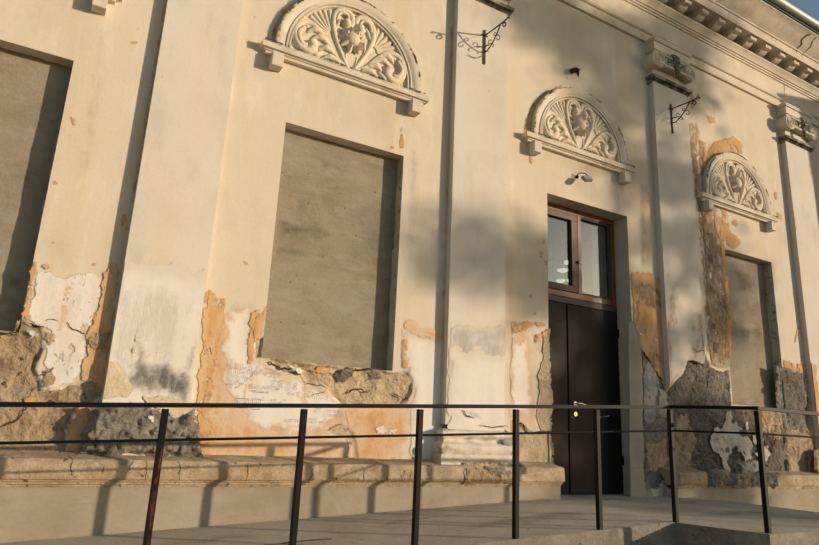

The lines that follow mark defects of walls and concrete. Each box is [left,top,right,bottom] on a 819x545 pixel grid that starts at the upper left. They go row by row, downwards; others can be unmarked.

peeling [707,137,742,162]
flaking render [0,262,232,457]
damp [130,365,187,392]
flaking render [254,339,413,404]
peeling [376,425,397,435]
flaking render [461,328,554,486]
flaking render [631,173,819,491]